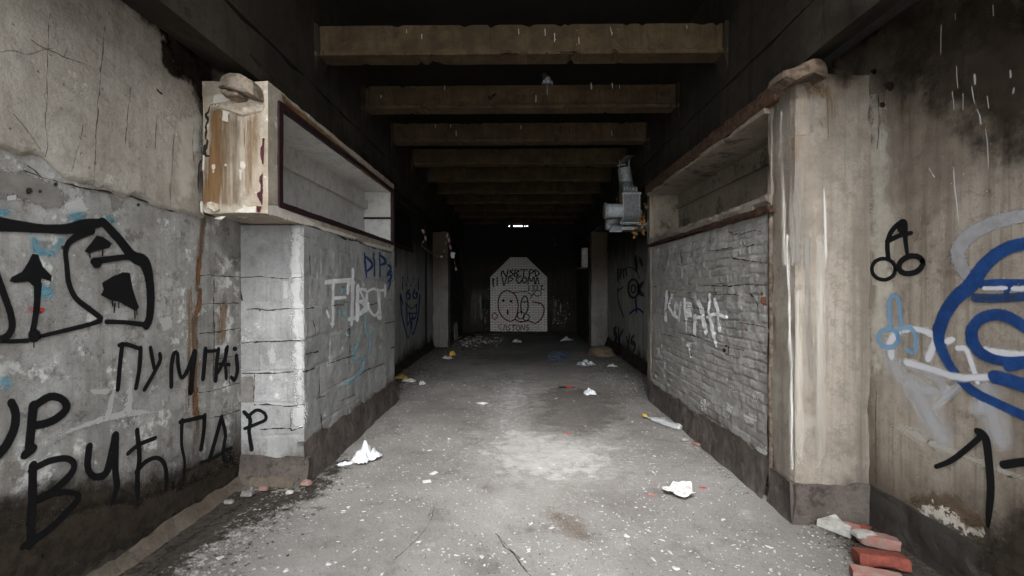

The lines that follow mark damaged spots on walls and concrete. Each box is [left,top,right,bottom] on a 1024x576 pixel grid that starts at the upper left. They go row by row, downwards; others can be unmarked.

crack [3,15,216,217]
corrosion [203,109,259,204]
corrosion [187,219,205,438]
corrosion [218,301,227,345]
peeling [911,493,986,539]